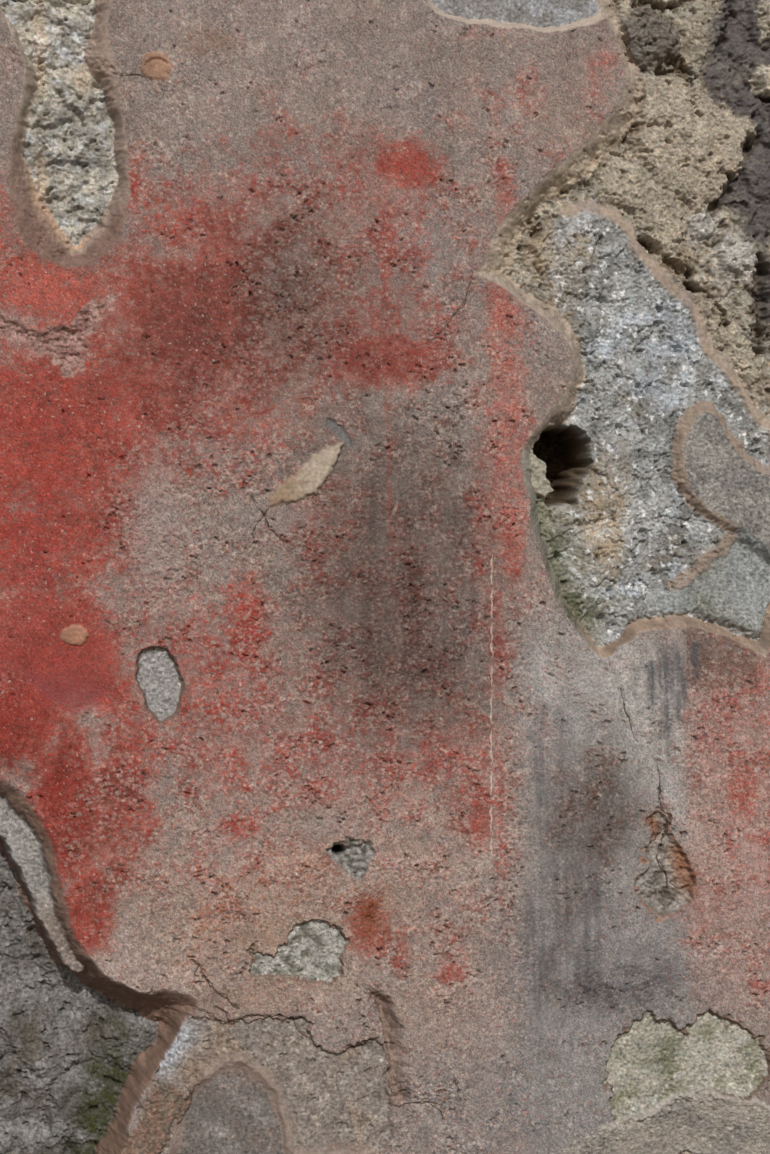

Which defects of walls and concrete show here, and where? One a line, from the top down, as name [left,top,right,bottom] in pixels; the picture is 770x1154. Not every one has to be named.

spalling [0,0,132,271]
spalling [428,0,770,659]
peeling [0,590,120,716]
spalling [135,646,186,724]
spalling [634,807,698,923]
spalling [0,779,412,1154]
crack [189,958,312,1040]
spalling [598,1009,770,1132]